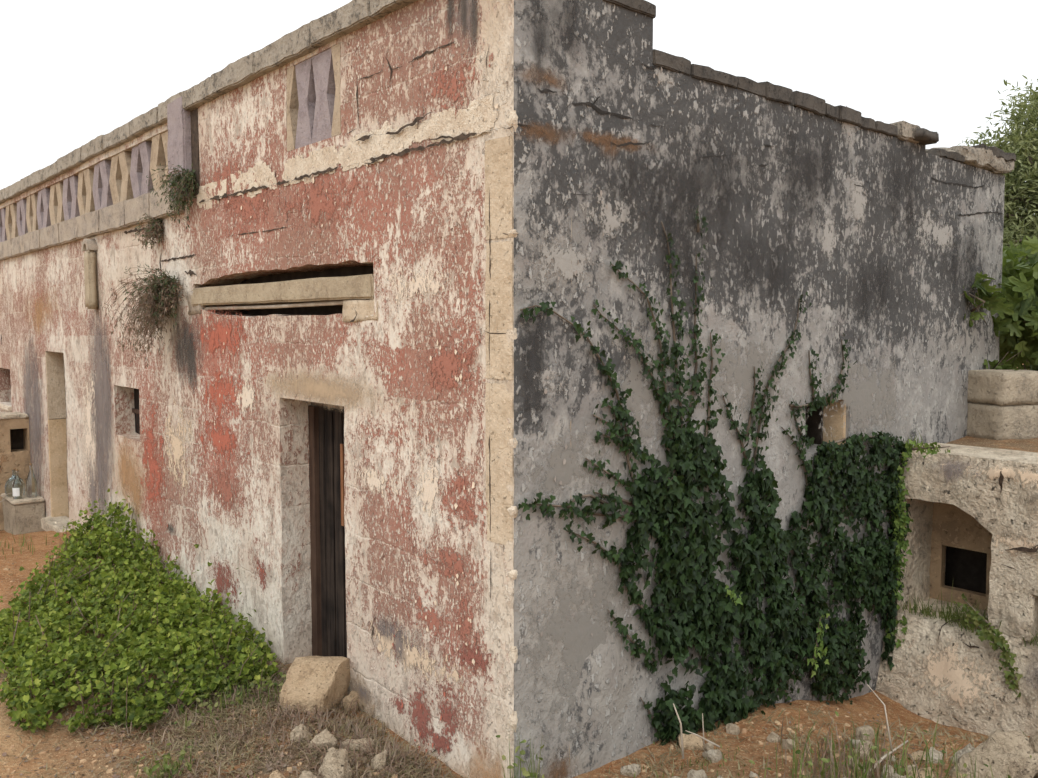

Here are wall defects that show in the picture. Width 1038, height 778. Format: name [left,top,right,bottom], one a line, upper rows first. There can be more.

spalling [197,49,518,245]
crack [199,41,549,236]
peeling [377,265,452,305]
peeling [419,321,475,405]
peeling [79,345,101,522]
peeling [137,304,267,551]
peeling [352,467,400,499]
peeling [417,454,488,531]
peeling [207,552,240,613]
peeling [255,559,267,595]
peeling [363,542,518,757]